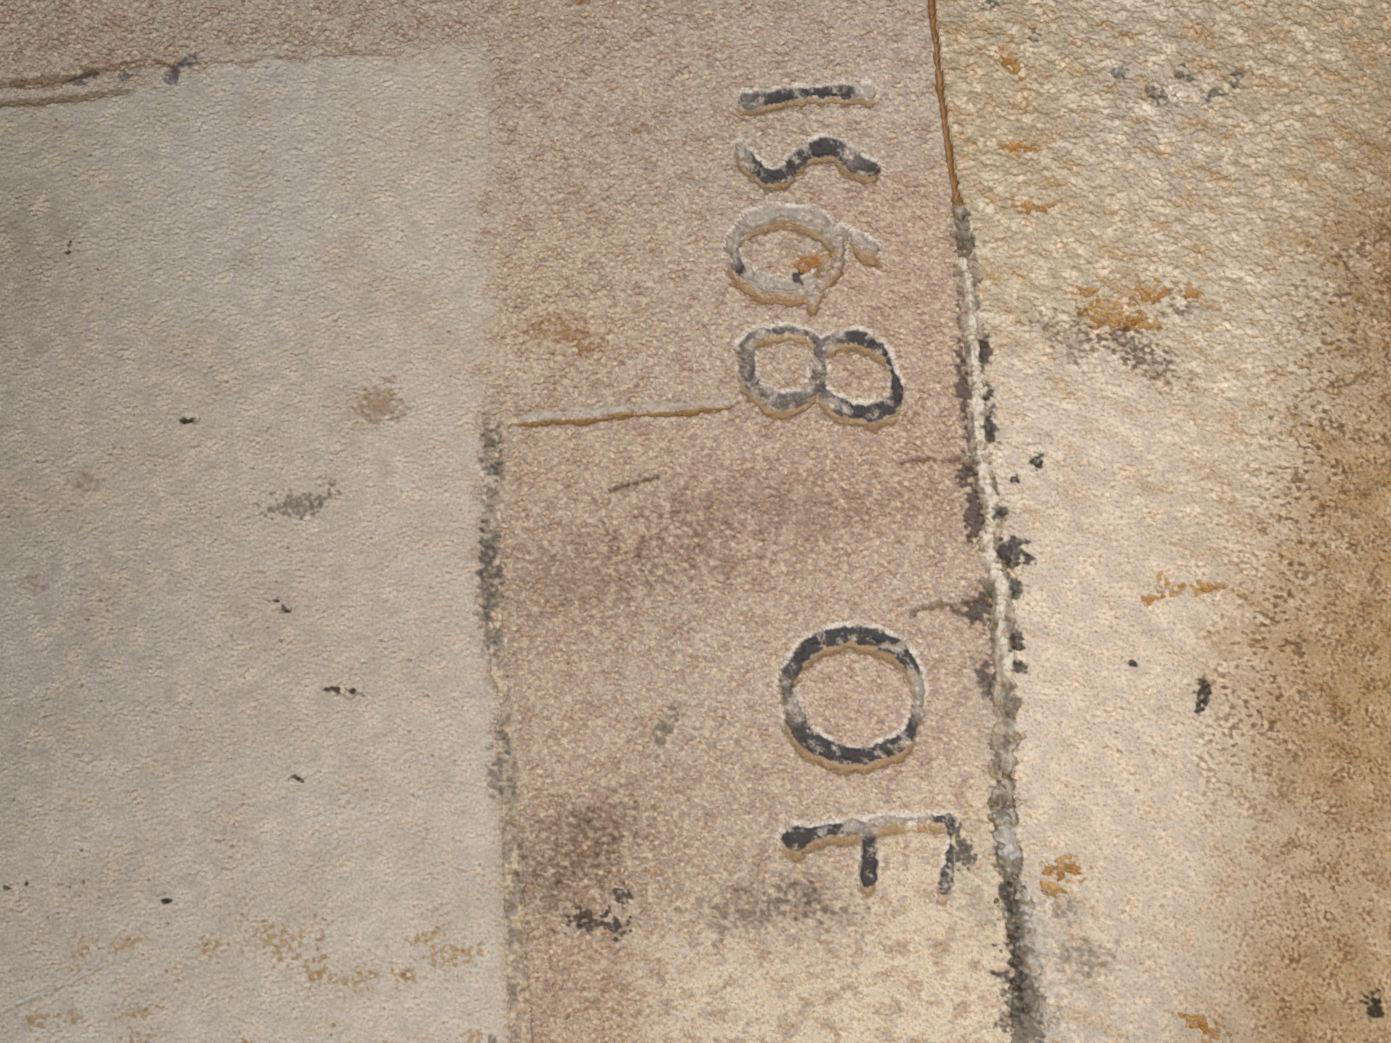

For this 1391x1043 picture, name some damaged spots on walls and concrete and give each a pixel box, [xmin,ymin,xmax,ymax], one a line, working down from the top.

leakage [1024,308,1172,384]